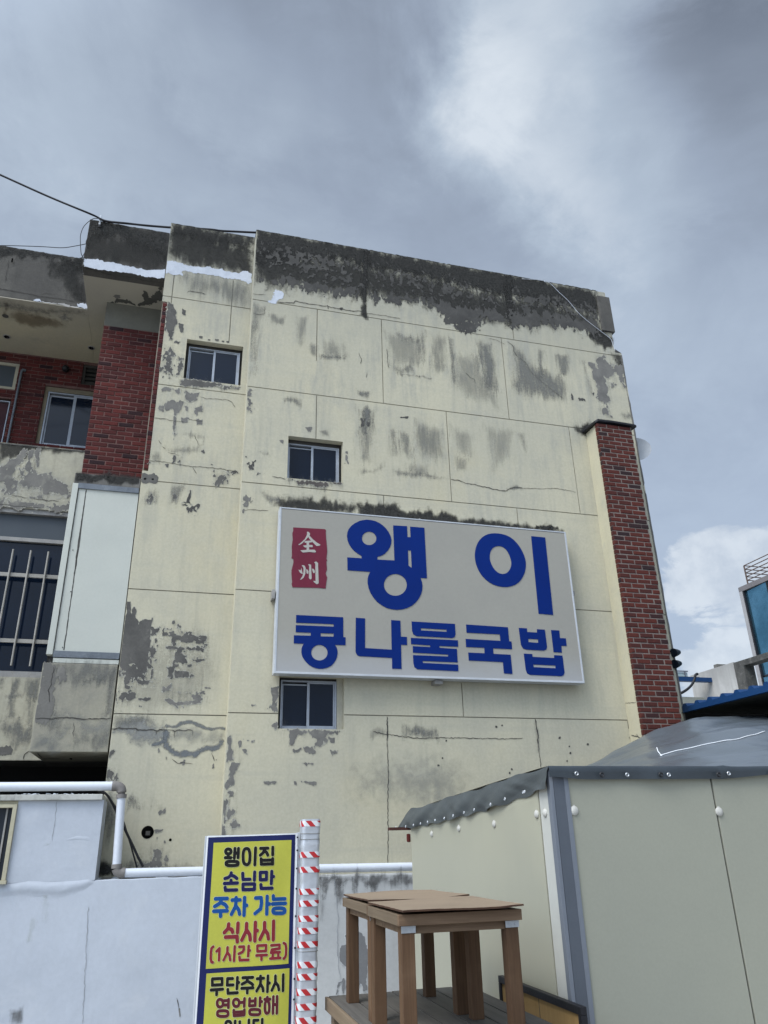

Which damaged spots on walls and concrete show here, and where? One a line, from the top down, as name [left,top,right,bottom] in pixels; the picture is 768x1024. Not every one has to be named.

leakage [0,220,622,366]
peeling [85,268,255,440]
leakage [479,343,493,388]
leakage [516,352,566,398]
peeling [0,447,71,515]
peeling [211,456,260,487]
leakage [242,495,563,532]
crack [452,479,570,491]
peeling [114,601,211,711]
leakage [0,679,38,759]
peeling [251,686,340,766]